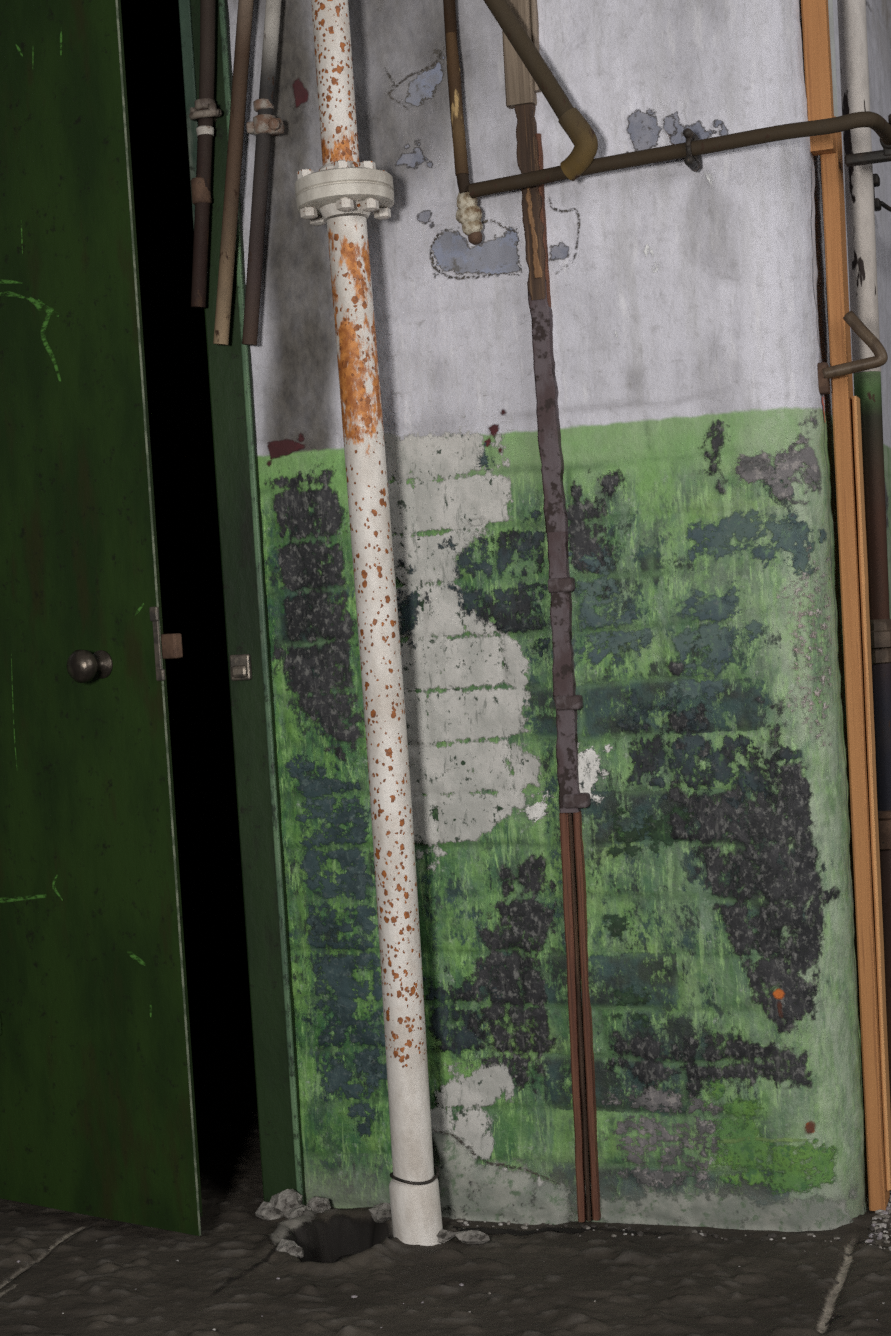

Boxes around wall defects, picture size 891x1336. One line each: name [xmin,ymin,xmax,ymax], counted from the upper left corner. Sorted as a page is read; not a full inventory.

peeling [417,210,522,278]
peeling [549,242,569,261]
peeling [384,409,555,874]
peeling [566,410,859,1232]
peeling [423,855,557,1209]
spalling [270,1210,316,1244]
crack [817,1238,857,1333]